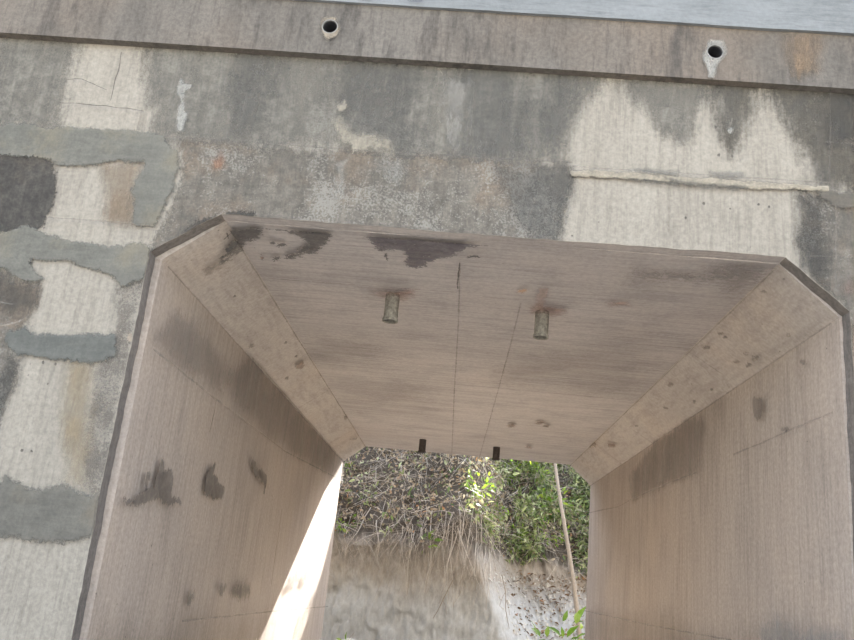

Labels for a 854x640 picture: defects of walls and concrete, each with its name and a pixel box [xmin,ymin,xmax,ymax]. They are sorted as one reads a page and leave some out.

water stain [145,47,600,254]
water stain [626,40,757,153]
water stain [770,89,854,190]
water stain [219,228,263,264]
water stain [798,189,854,365]
water stain [123,460,181,507]
water stain [204,463,225,501]